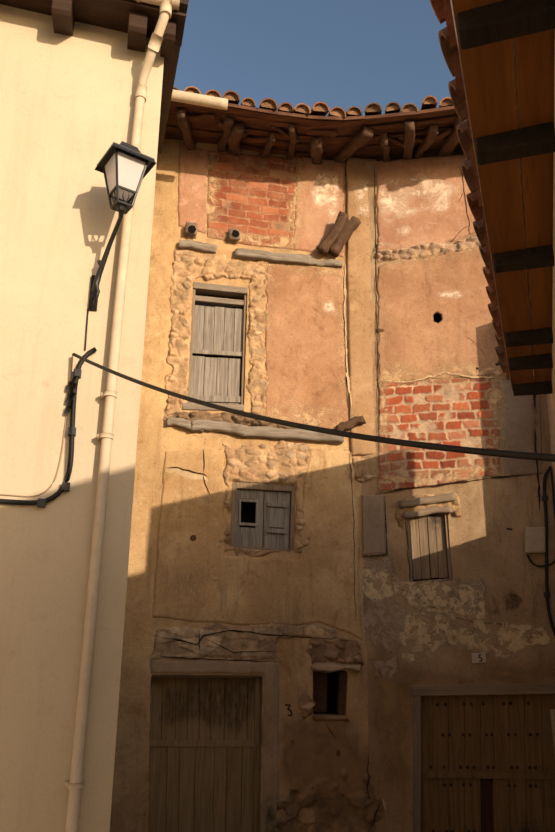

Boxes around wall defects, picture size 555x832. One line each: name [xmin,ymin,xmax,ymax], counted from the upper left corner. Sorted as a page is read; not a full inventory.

crack [374,169,498,392]
crack [165,448,211,497]
flaking render [351,367,499,529]
crack [154,630,327,662]
spalling [150,622,364,665]
peeling [361,568,550,667]